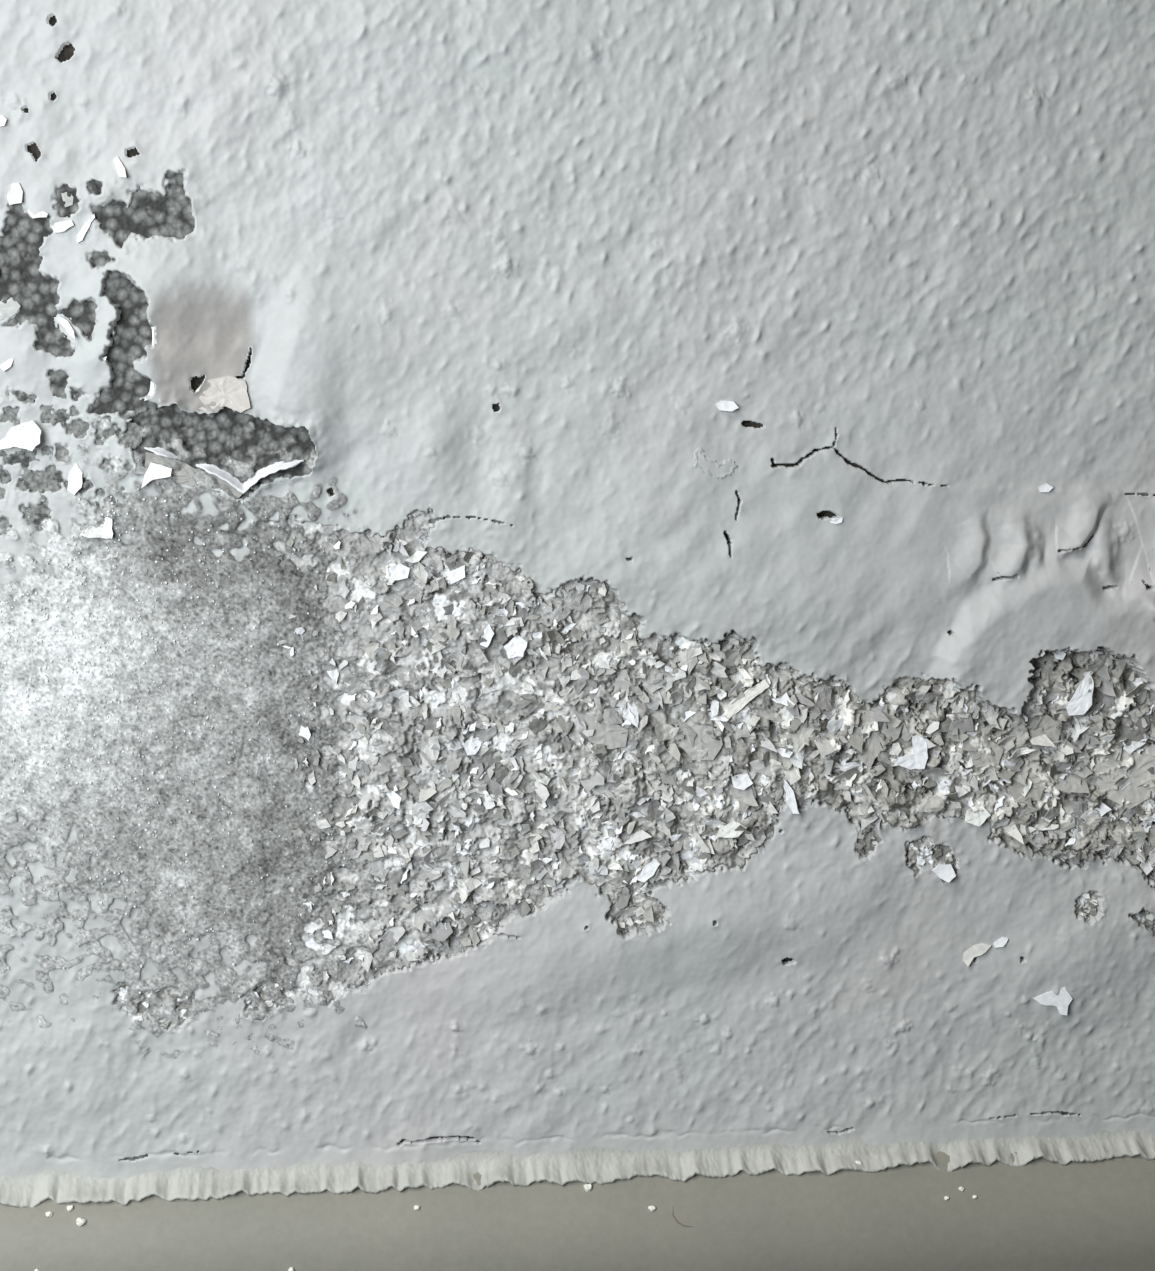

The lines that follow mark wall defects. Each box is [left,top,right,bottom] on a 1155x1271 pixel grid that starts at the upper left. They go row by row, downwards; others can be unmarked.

peeling [27,143,41,161]
flaking render [0,148,317,560]
water stain [87,418,117,434]
crack [741,420,763,428]
crack [771,433,924,483]
water stain [0,427,396,1060]
flaking render [245,509,1155,1015]
flaking render [114,983,195,1030]